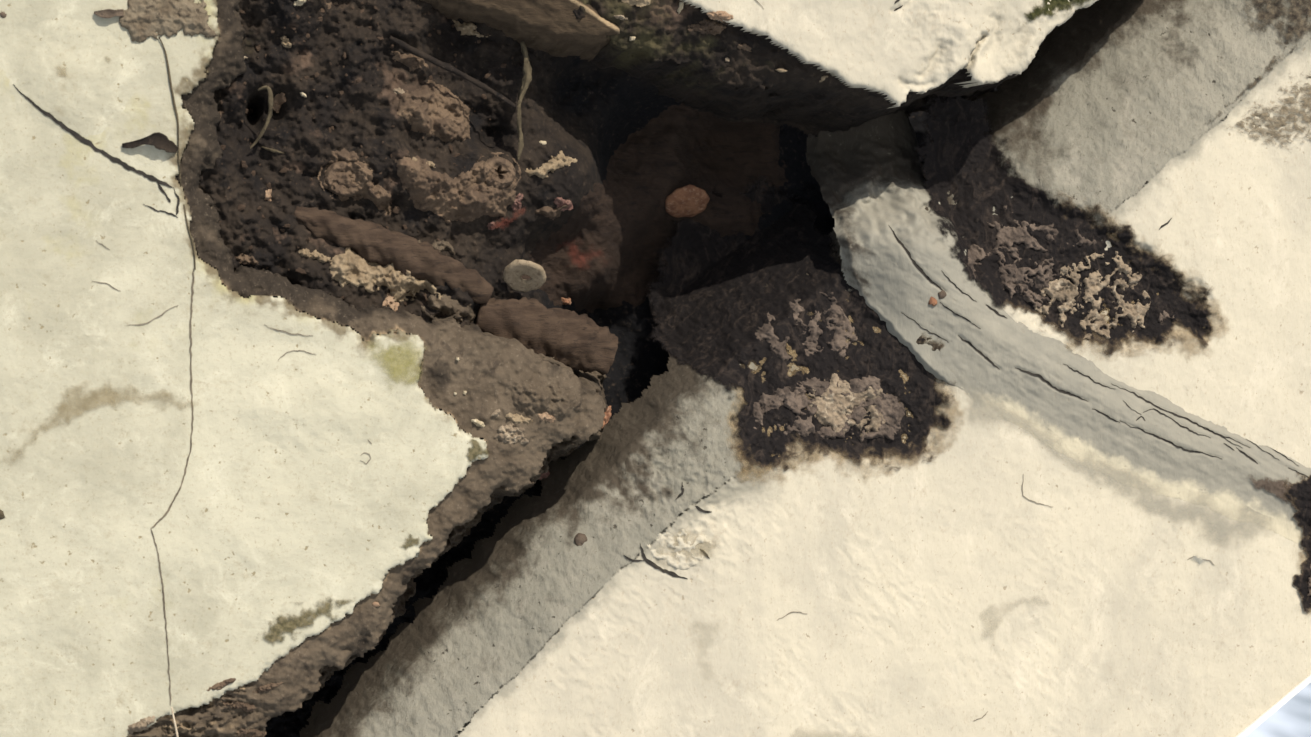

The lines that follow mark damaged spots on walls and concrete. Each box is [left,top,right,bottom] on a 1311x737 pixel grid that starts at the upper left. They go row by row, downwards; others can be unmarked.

spalling [119,0,1021,737]
crack [889,226,1309,478]
crack [624,544,710,579]
crack [676,482,712,513]